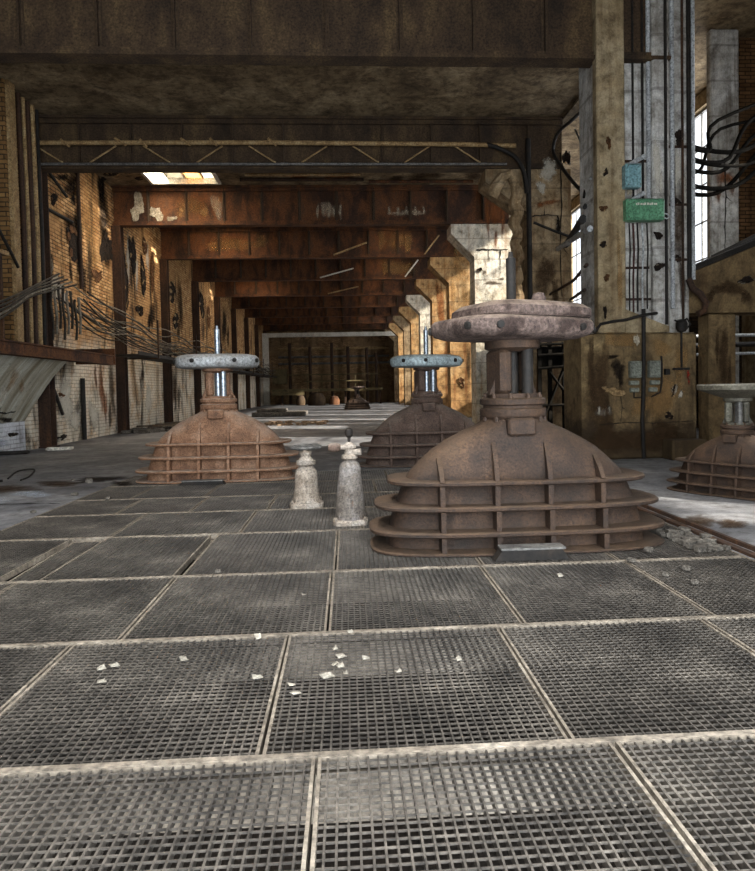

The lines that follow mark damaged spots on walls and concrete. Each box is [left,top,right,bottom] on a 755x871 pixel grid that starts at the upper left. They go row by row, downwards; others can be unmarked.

peeling [130,192,178,221]
spalling [91,231,113,283]
flaking render [124,236,155,316]